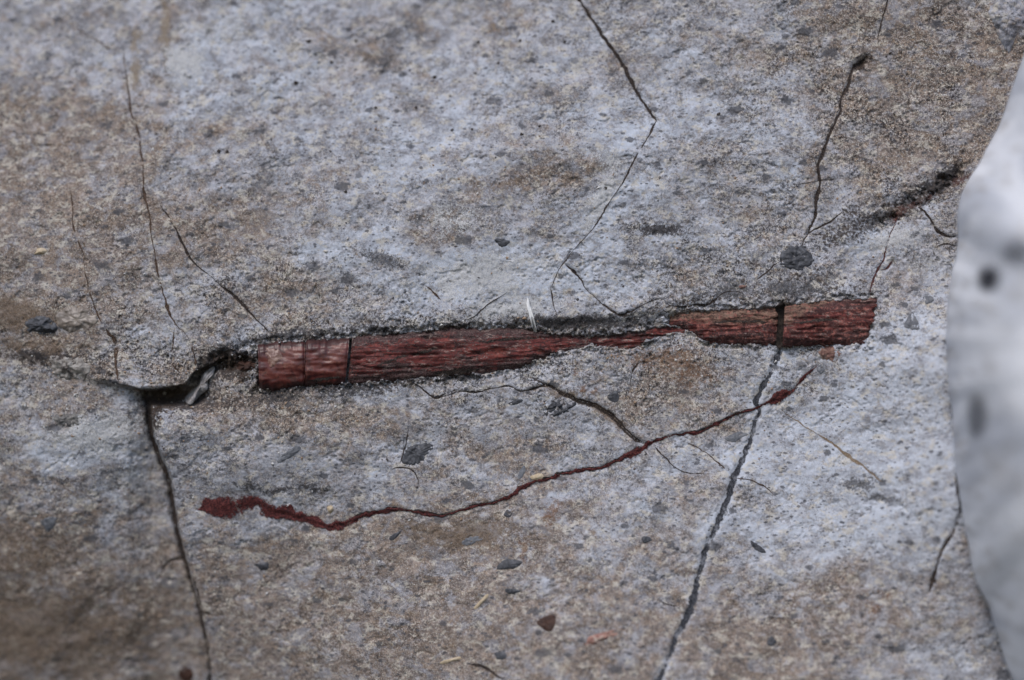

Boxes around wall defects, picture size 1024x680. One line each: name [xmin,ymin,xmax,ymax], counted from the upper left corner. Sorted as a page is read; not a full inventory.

crack [70,189,119,380]
crack [77,28,269,371]
crack [550,0,780,318]
crack [802,59,864,245]
crack [144,393,212,680]
spalling [129,351,259,430]
crack [353,376,777,517]